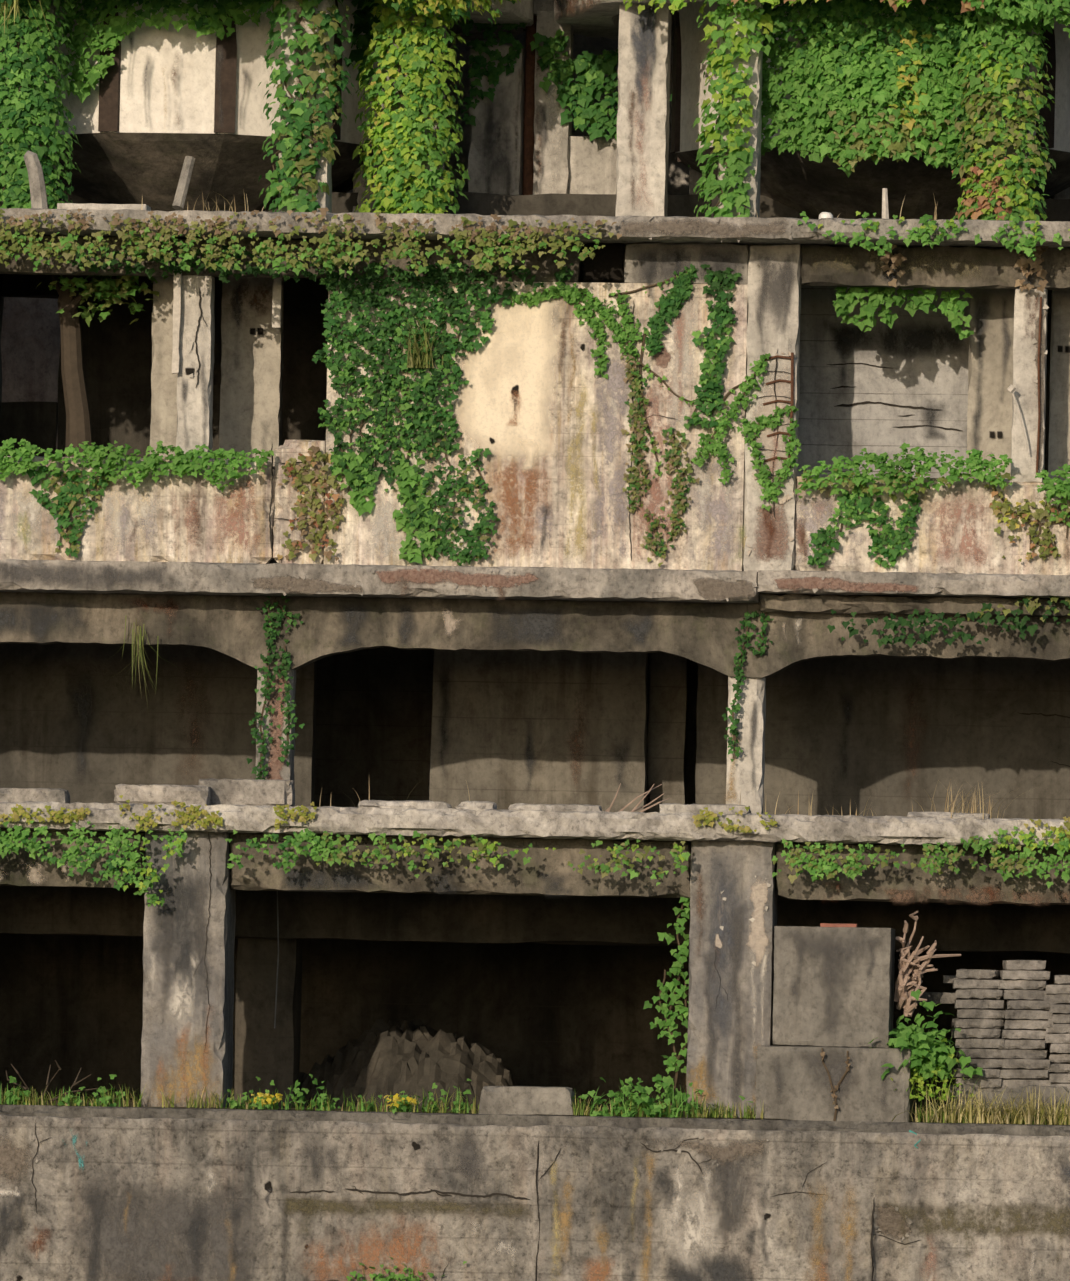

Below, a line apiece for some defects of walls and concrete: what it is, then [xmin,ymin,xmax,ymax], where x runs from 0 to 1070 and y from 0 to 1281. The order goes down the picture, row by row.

damp [631,6,655,99]
crack [190,288,207,387]
damp [829,325,961,382]
damp [925,407,938,436]
rust [496,469,539,548]
damp [0,1190,21,1234]
crack [290,1141,561,1281]